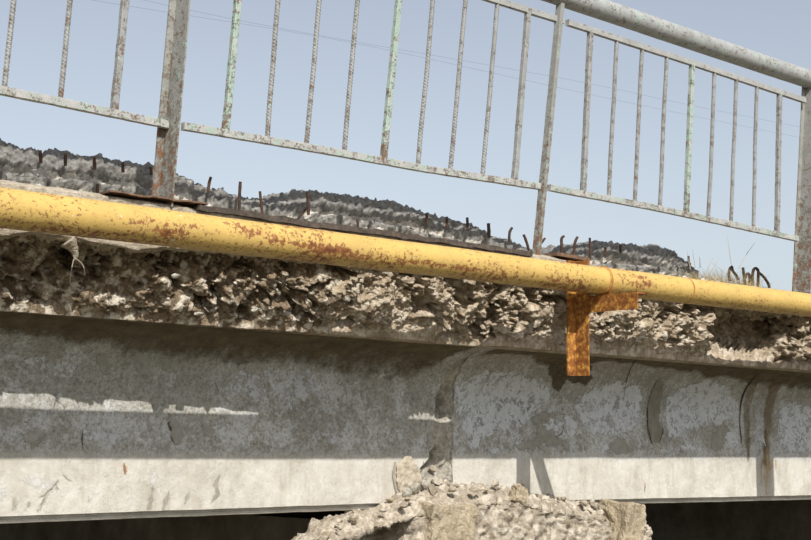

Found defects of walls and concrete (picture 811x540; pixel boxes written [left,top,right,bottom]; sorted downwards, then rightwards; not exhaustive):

spalling [296,192,310,219]
spalling [0,235,811,455]
crack [740,373,759,442]
spalling [392,455,424,493]